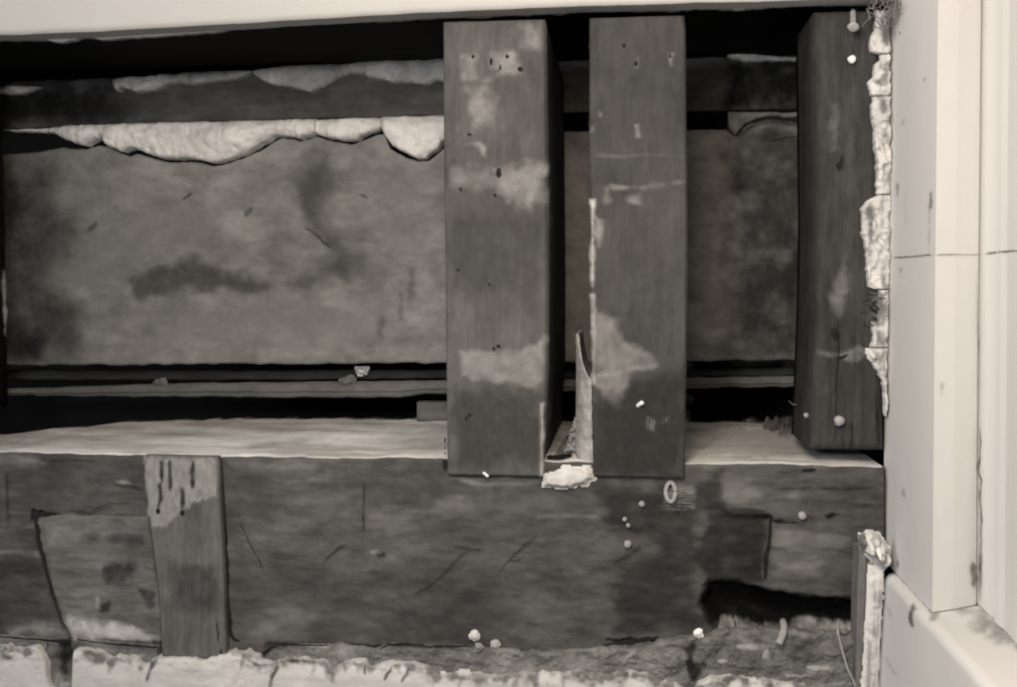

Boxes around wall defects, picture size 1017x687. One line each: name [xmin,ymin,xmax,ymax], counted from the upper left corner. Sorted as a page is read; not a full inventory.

flaking render [852,4,892,416]
water stain [604,476,851,632]